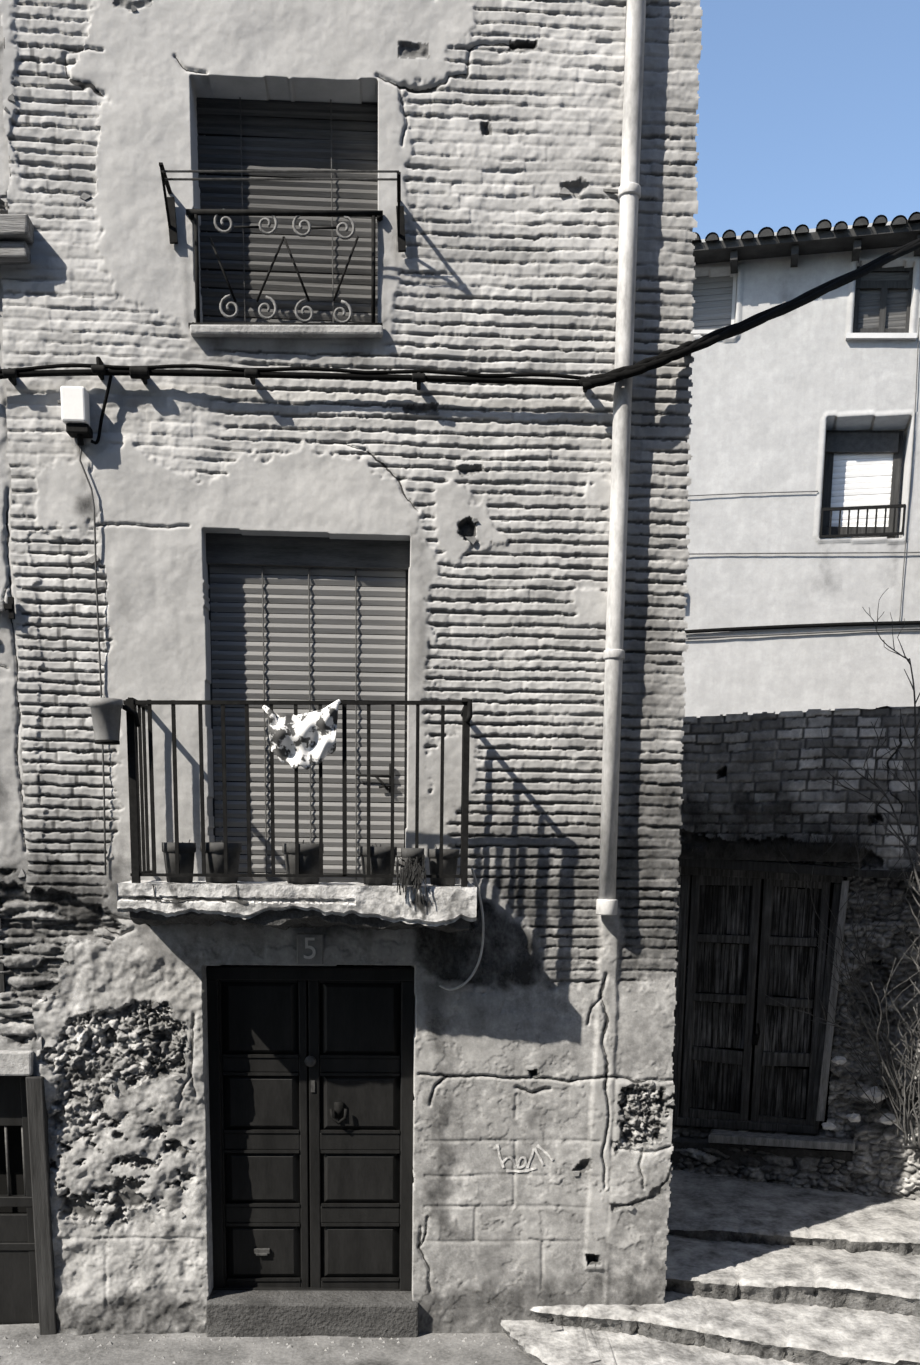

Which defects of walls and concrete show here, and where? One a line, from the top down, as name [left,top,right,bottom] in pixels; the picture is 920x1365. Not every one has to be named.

spalling [113,0,153,12]
spalling [398,40,431,59]
spalling [508,39,538,50]
flaking render [4,0,101,201]
spalling [559,176,592,198]
spalling [456,463,487,476]
crack [0,494,26,851]
flaking render [0,527,203,1237]
water stain [411,894,541,988]
crack [419,976,671,1189]
spalling [611,1078,675,1154]
crack [418,1217,431,1290]